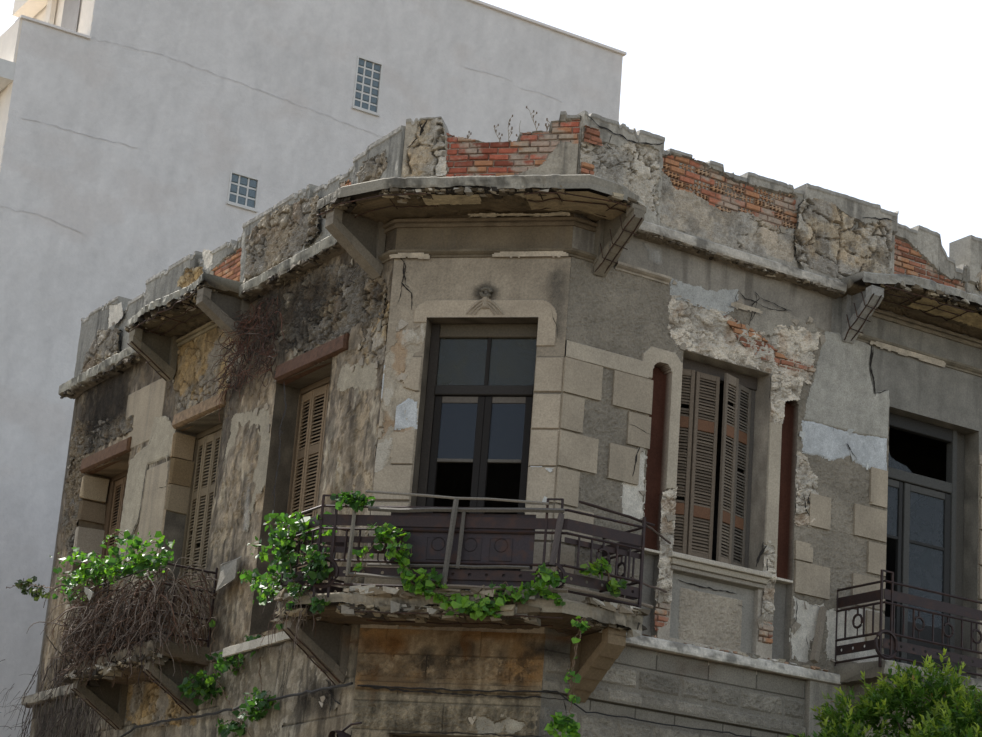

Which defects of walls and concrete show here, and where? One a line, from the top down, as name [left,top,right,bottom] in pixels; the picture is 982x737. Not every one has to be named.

crack [398,258,413,310]
flaking render [60,118,982,561]
crack [870,346,886,396]